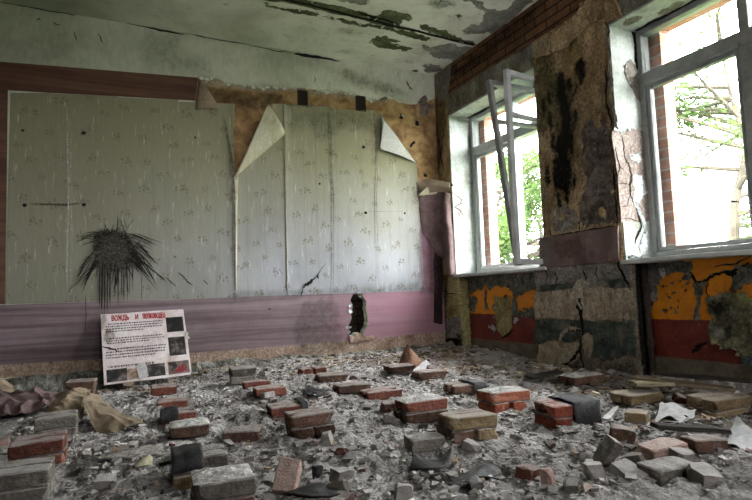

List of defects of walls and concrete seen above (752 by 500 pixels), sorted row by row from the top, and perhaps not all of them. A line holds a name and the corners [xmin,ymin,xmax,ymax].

crack [1,2,77,39]
crack [115,21,339,62]
peeling [195,76,356,176]
peeling [263,0,533,191]
water stain [534,41,587,208]
crack [549,22,642,245]
spalling [577,116,650,251]
water stain [66,196,176,311]
spalling [189,252,462,372]
peeling [467,262,636,366]
crack [561,267,599,368]
crack [689,256,751,296]